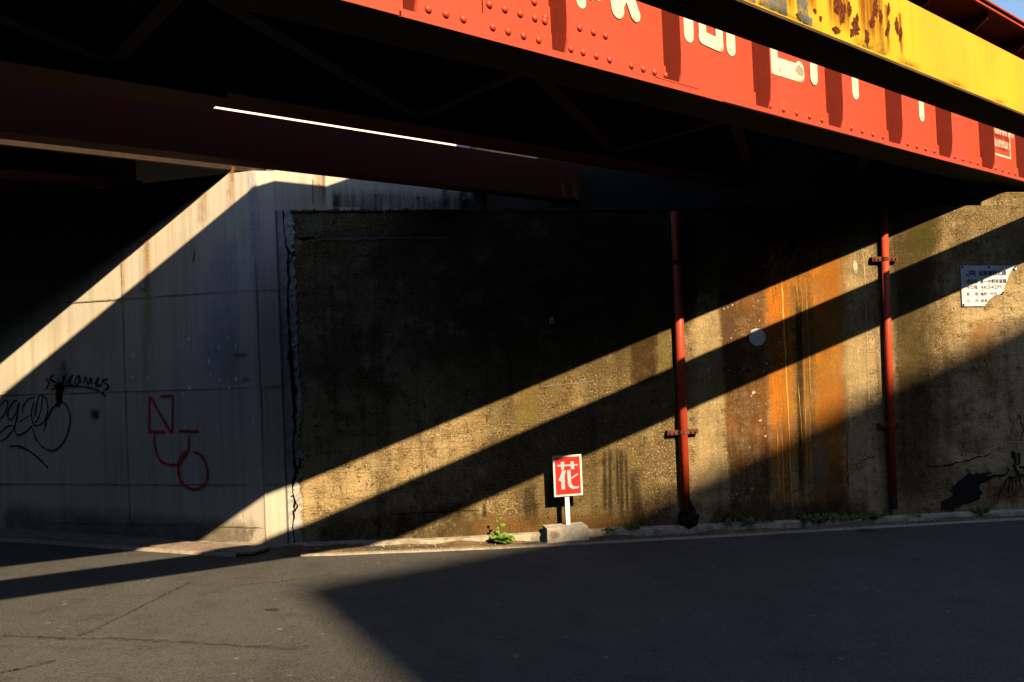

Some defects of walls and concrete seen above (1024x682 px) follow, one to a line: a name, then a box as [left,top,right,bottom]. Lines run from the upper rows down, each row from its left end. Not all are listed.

rust [796,0,903,45]
crack [282,210,314,543]
rust [766,241,843,502]
crack [925,453,991,467]
peeling [942,471,991,511]